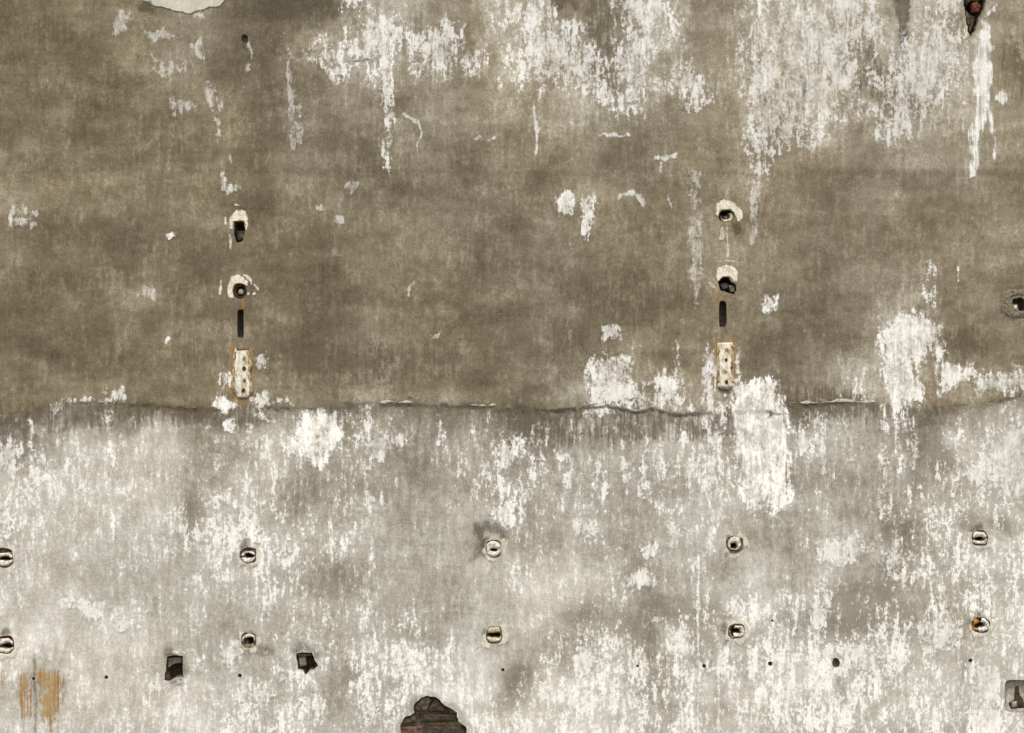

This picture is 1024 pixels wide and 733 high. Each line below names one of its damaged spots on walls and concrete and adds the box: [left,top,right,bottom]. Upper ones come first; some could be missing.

peeling [309,0,480,172]
peeling [489,0,714,137]
peeling [735,0,986,175]
crack [396,396,475,408]
crack [536,398,712,417]
peeling [875,262,1024,520]
peeling [571,519,598,537]
peeling [584,325,832,733]
peeling [816,531,925,587]
corrosion [18,669,64,732]
peeling [363,697,385,727]
spalling [385,642,467,733]